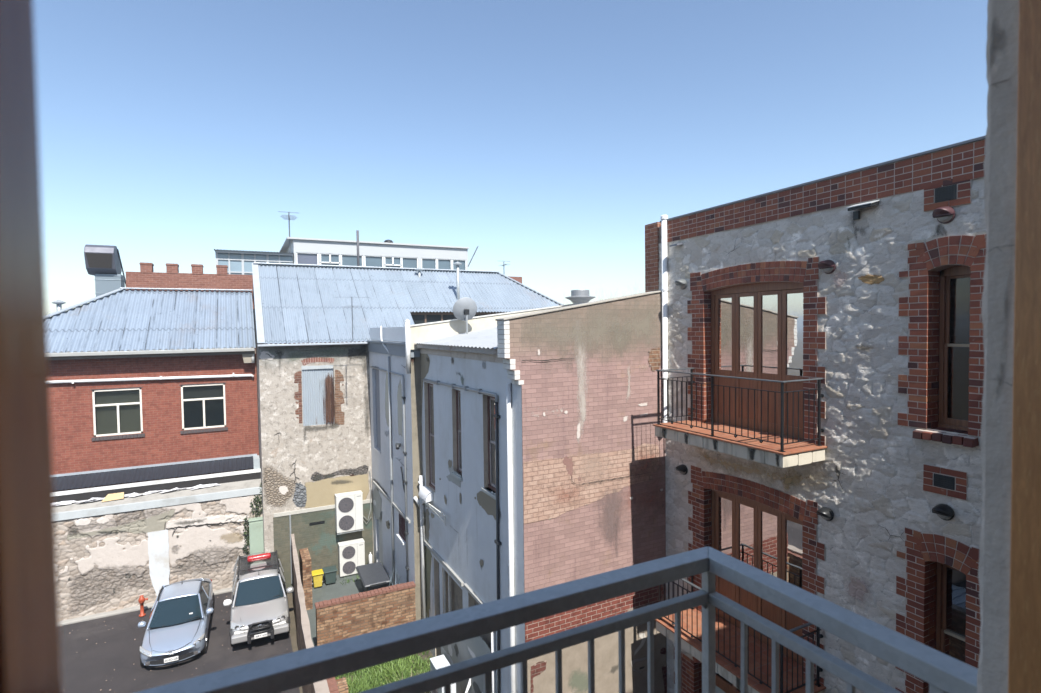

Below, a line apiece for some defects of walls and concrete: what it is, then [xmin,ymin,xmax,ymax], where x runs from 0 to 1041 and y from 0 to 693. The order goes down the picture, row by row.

flaking render [263,465,369,507]
flaking render [70,517,109,535]